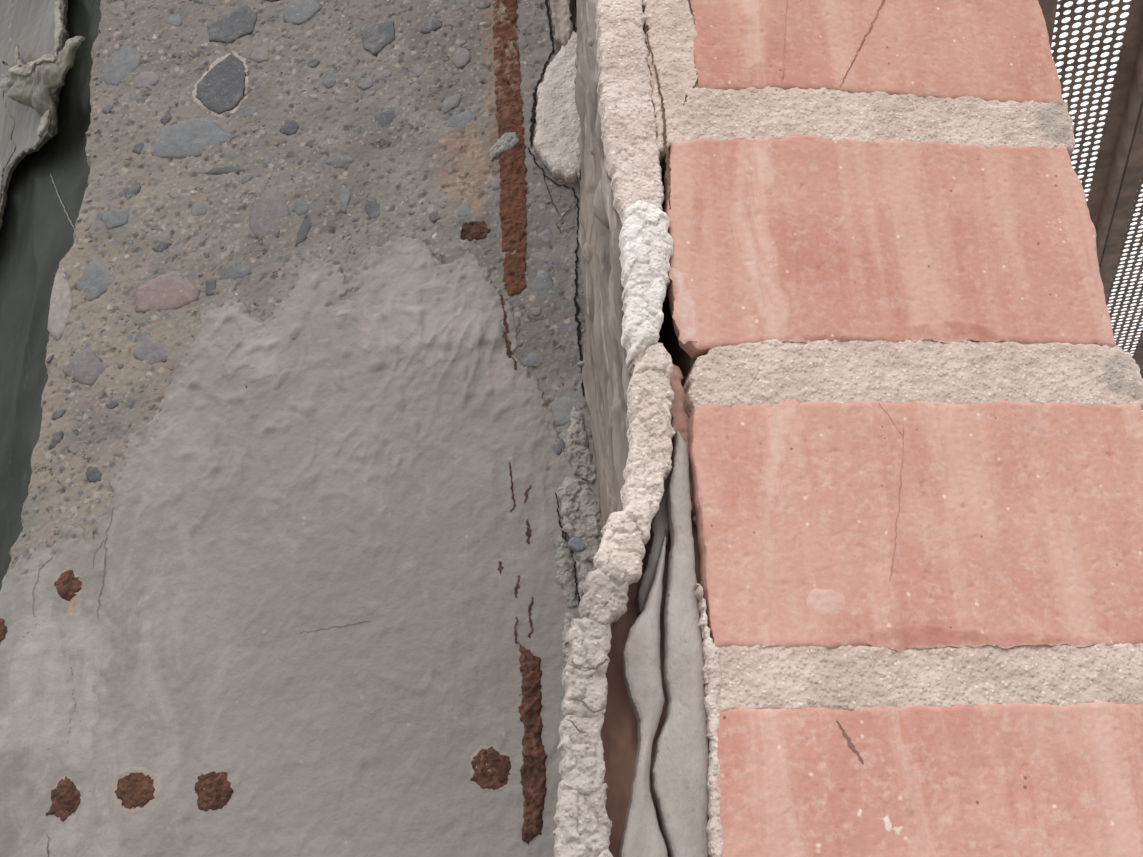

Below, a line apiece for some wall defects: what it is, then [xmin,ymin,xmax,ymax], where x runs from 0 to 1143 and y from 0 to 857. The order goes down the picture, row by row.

crack [840,0,885,87]
corrosion [424,0,501,241]
crack [645,23,698,209]
crack [527,0,585,396]
spalling [6,0,709,857]
corrosion [54,567,82,618]
corrosion [0,618,8,642]
corrosion [514,597,534,644]
corrosion [46,775,83,821]
corrosion [111,767,163,815]
corrosion [194,770,234,812]
corrosion [470,745,513,791]